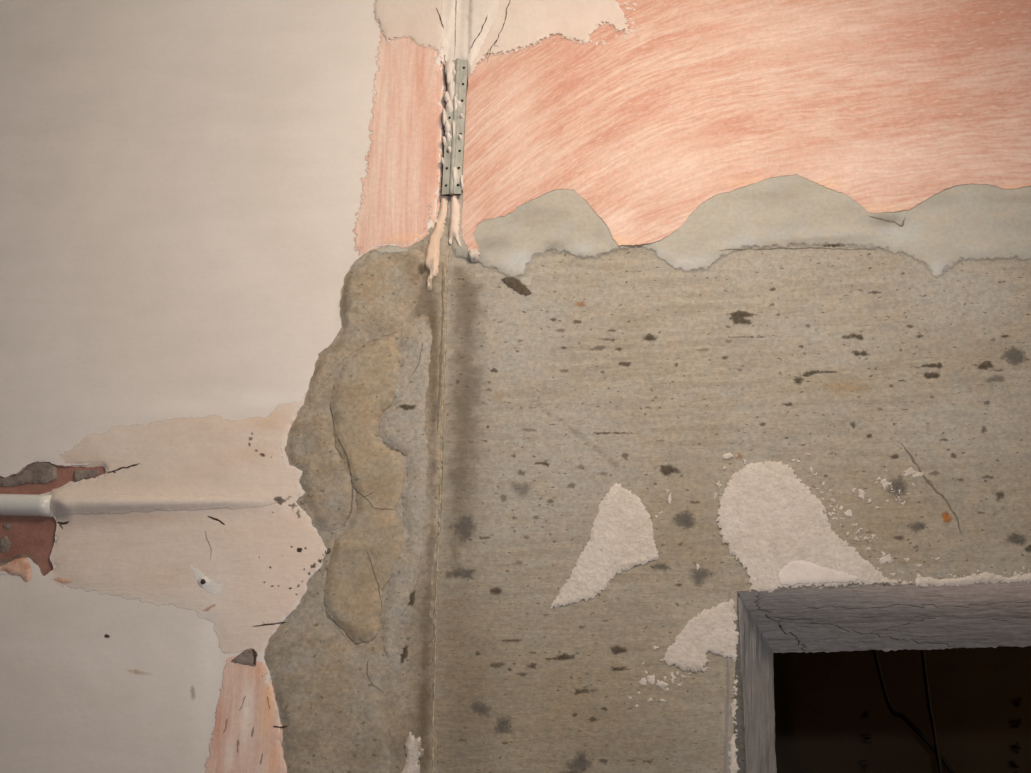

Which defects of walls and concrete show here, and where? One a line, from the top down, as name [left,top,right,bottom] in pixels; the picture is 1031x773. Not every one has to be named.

spalling [501,276,532,296]
spalling [730,311,753,324]
spalling [921,363,942,378]
spalling [0,462,106,495]
spalling [204,188,480,773]
crack [901,443,962,535]
leakage [676,511,693,527]
peeling [791,453,940,577]
spalling [0,516,73,583]
peeling [628,662,709,708]